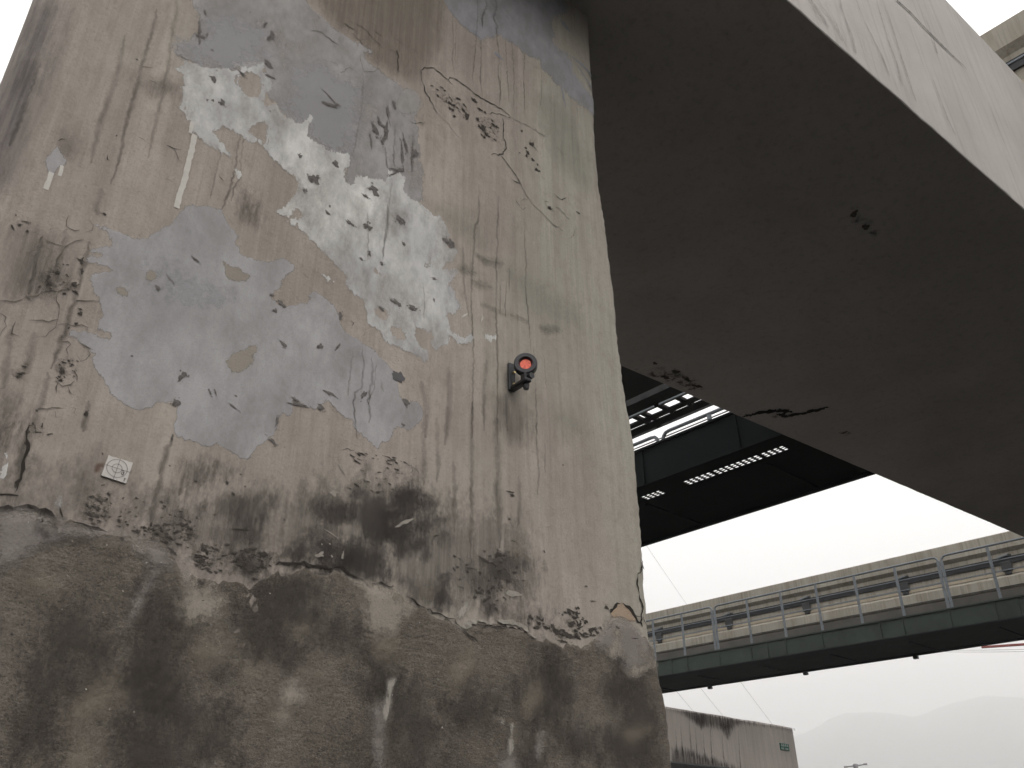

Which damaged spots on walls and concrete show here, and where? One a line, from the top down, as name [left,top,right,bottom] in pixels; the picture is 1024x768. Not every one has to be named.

peeling [369,101,419,176]
crack [322,24,576,236]
spalling [431,85,499,141]
peeling [303,174,321,194]
peeling [377,298,421,312]
crack [0,289,107,532]
peeling [289,390,338,412]
crack [742,406,829,418]
leakage [11,452,659,768]
crack [276,561,478,642]
spalling [527,600,641,656]
crack [636,559,646,627]